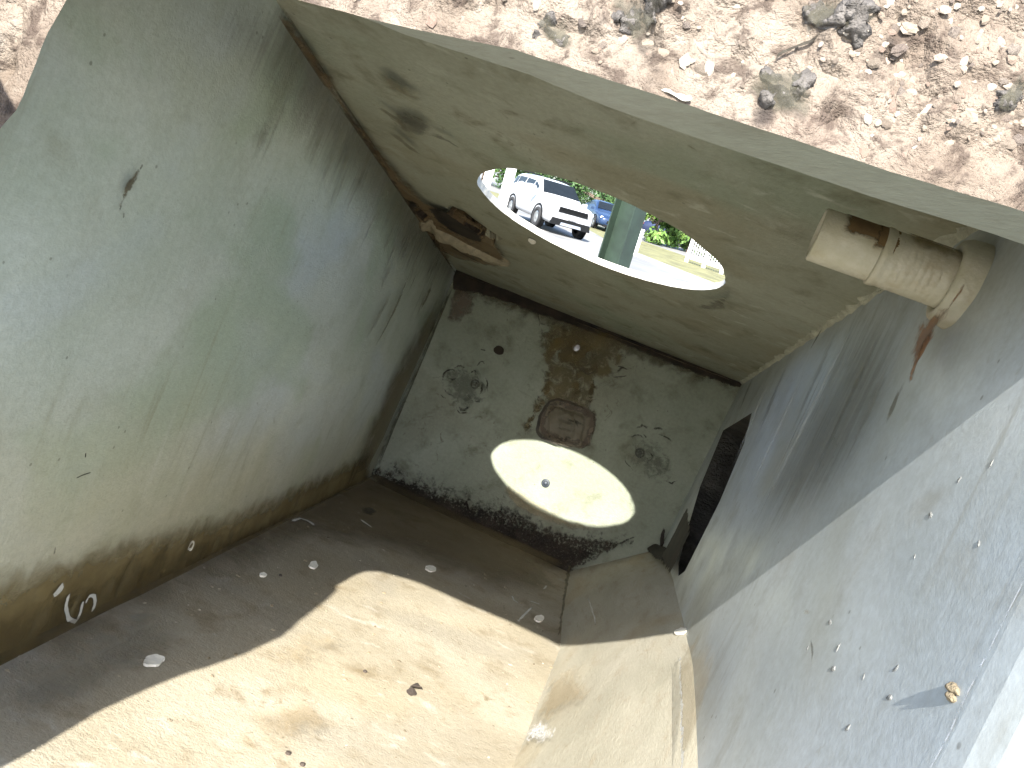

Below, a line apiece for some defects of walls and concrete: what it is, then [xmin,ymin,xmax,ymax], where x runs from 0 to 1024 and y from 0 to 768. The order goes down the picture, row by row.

spalling [409,201,511,267]
corrosion [910,286,964,381]
damp [0,293,634,666]